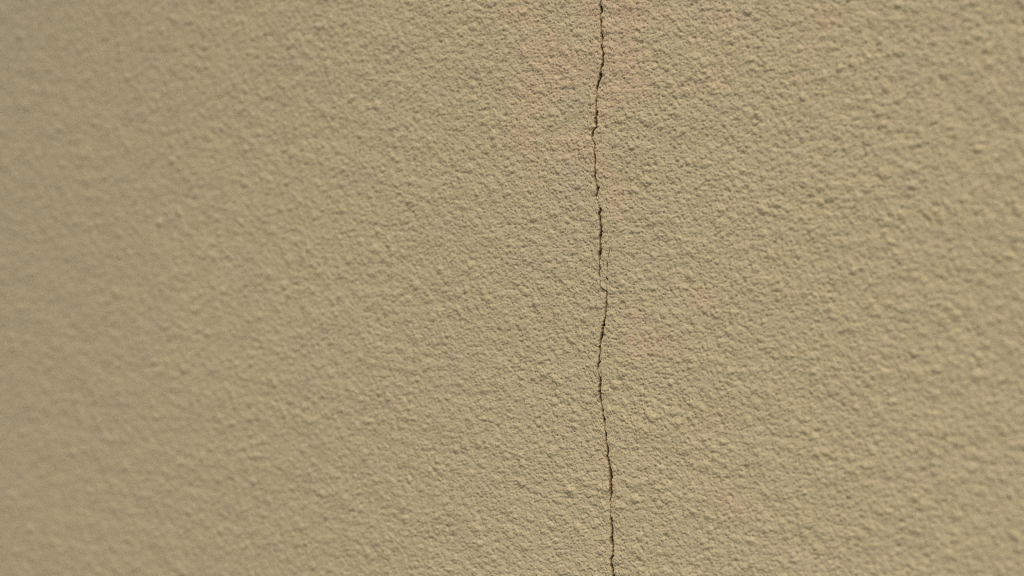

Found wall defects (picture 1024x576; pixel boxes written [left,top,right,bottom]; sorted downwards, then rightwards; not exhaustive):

crack [591,0,615,576]